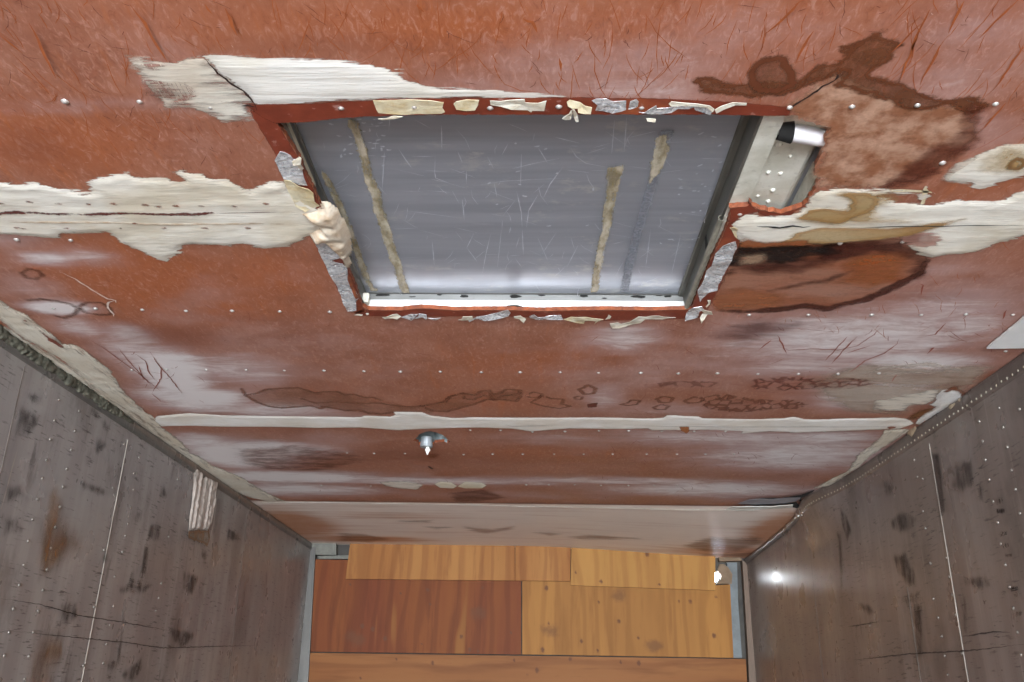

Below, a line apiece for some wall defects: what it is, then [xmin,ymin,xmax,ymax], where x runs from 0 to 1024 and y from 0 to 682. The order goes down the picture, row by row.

peeling [129,56,251,123]
peeling [373,99,546,120]
peeling [562,99,747,122]
damp [693,32,989,313]
peeling [382,313,440,321]
peeling [459,310,676,329]
damp [241,385,598,414]
peeling [874,390,962,424]